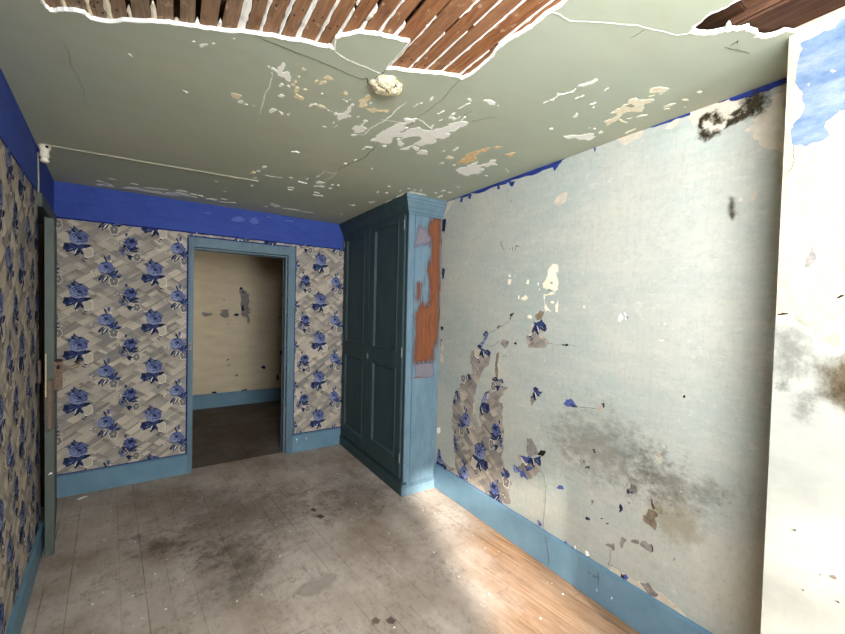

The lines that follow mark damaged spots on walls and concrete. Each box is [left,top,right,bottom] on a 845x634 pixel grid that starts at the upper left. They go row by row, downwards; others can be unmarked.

spalling [40,0,568,80]
crack [259,37,384,88]
peeling [268,63,389,136]
crack [319,84,456,180]
peeling [362,98,472,155]
peeling [543,78,598,104]
peeling [563,87,668,145]
damp [698,91,771,141]
peeling [96,179,236,203]
peeling [439,146,515,177]
spalling [663,0,845,346]
damp [822,362,845,408]